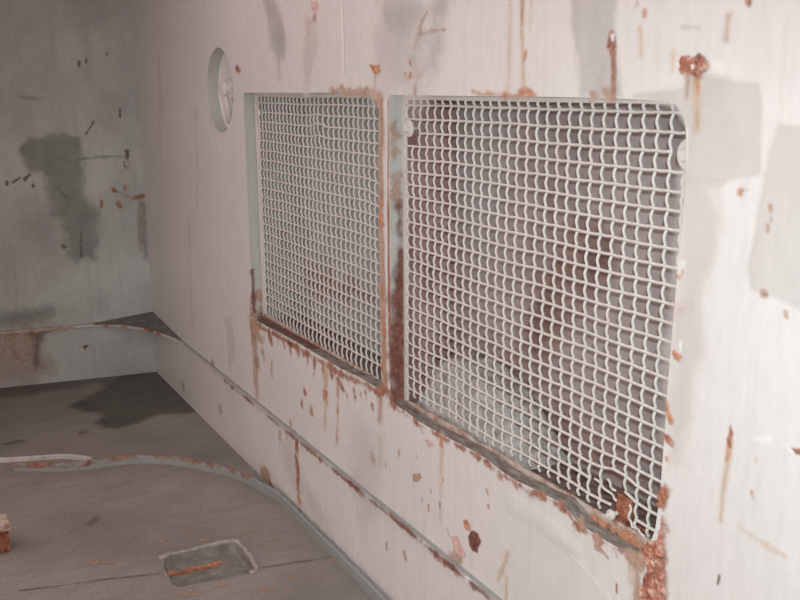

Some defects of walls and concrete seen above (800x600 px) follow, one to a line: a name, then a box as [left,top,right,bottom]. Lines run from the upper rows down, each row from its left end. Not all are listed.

rust [503,86,535,98]
rust [590,31,615,101]
rust [679,54,709,129]
leakage [20,135,98,259]
rust [250,85,404,425]
leakage [72,372,195,427]
rust [432,431,603,547]
rust [618,485,668,600]